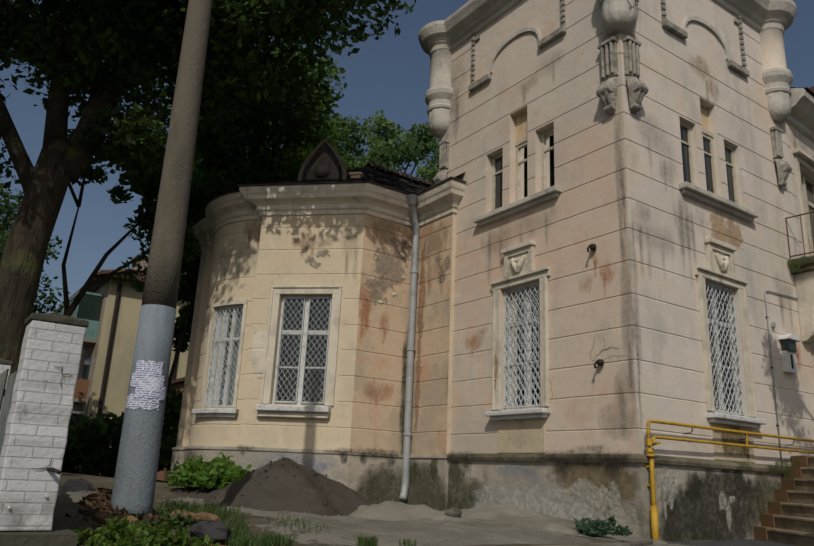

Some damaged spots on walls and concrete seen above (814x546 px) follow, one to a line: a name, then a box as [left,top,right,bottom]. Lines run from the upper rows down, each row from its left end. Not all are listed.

spalling [367,237,410,305]
peeling [414,244,427,427]
damp [357,458,635,522]
peeling [555,479,622,526]
damp [661,469,791,541]